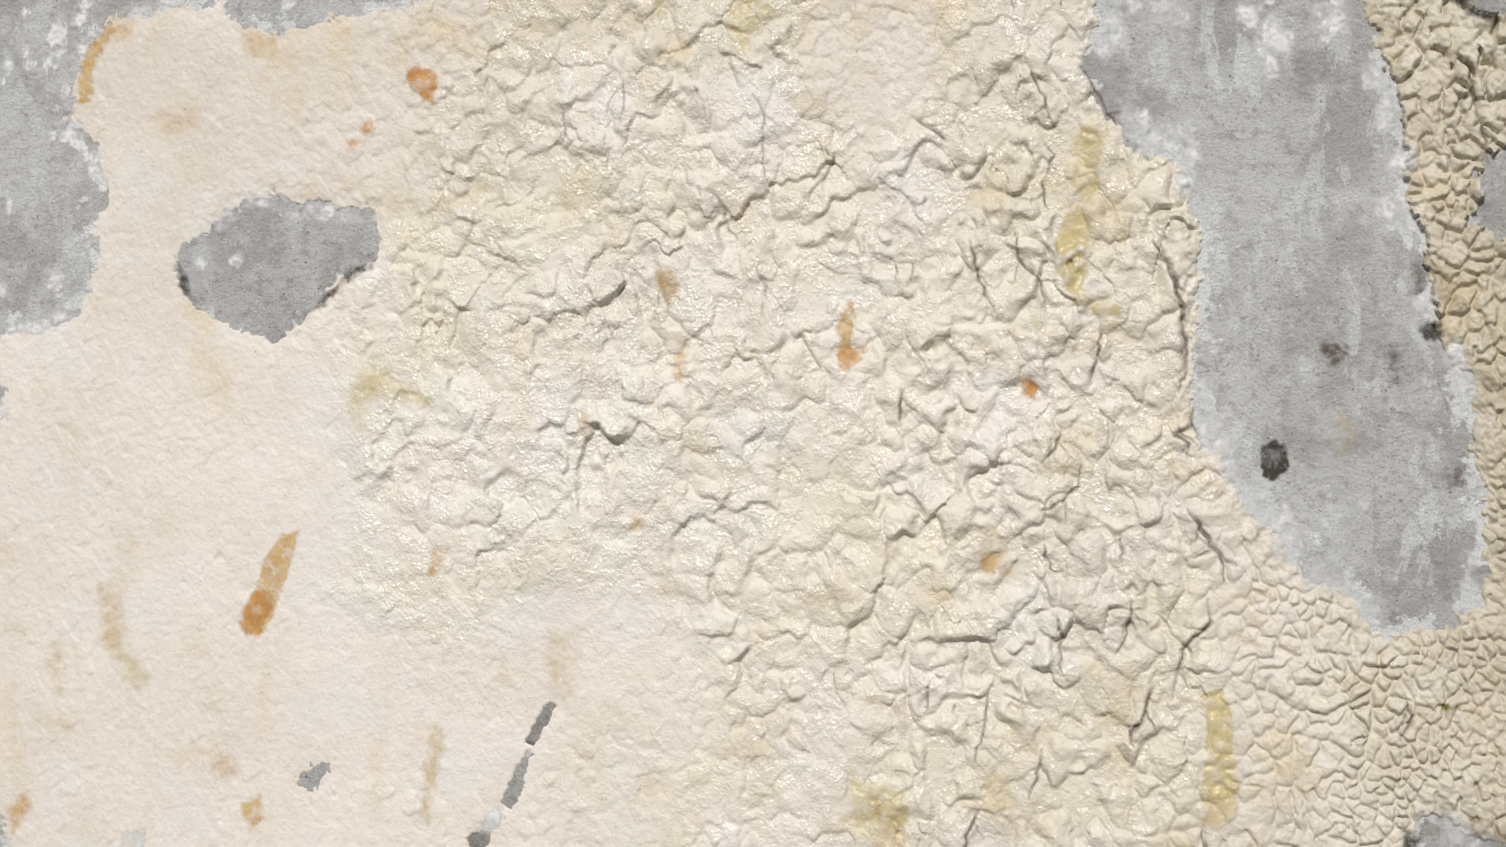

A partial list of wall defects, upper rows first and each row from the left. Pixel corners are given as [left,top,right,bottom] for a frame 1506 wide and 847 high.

water stain [1455,0,1497,20]
corrosion [407,68,436,102]
peeling [0,0,421,344]
corrosion [837,302,858,368]
peeling [1080,0,1506,642]
crack [555,0,1506,847]
corrosion [241,532,297,634]
peeling [294,762,331,792]
crack [392,776,536,847]
peeling [467,832,490,847]
peeling [501,703,557,809]
peeling [1403,813,1506,847]